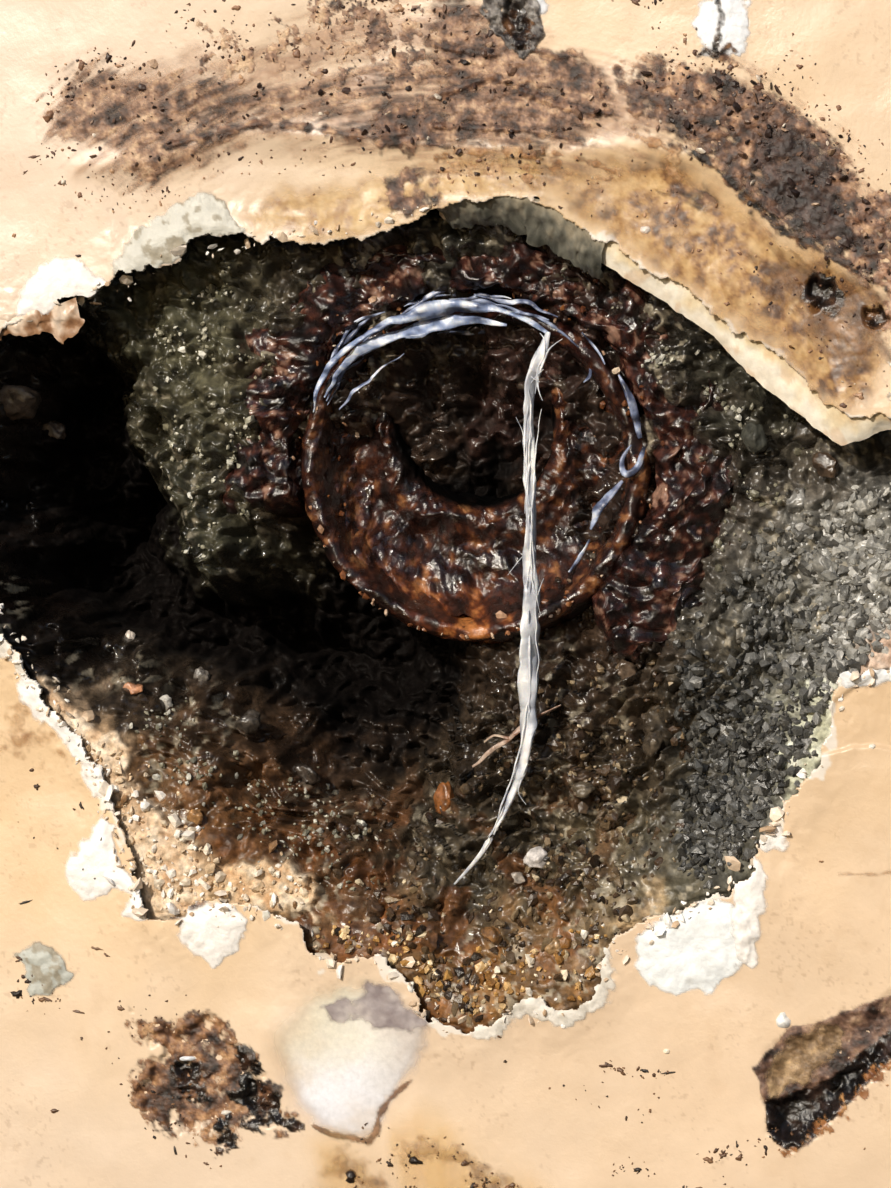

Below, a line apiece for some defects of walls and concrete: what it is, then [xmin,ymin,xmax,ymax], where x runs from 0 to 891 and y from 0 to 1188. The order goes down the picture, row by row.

leakage [47,0,891,403]
spalling [0,193,891,1039]
leakage [568,374,646,573]
spalling [752,996,891,1157]